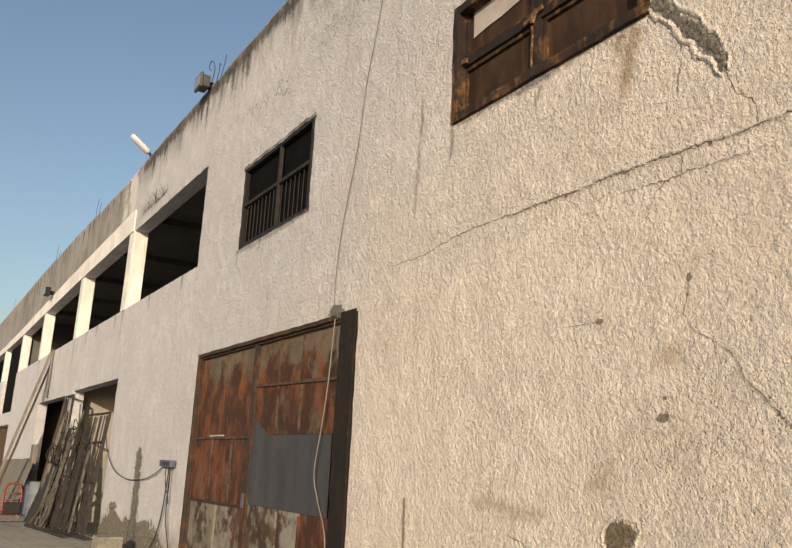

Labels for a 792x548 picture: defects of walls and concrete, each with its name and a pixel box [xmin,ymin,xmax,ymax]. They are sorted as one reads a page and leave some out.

water stain [138,0,299,174]
spalling [649,0,732,92]
crack [394,73,792,266]
crack [683,272,791,426]
spalling [600,515,642,548]